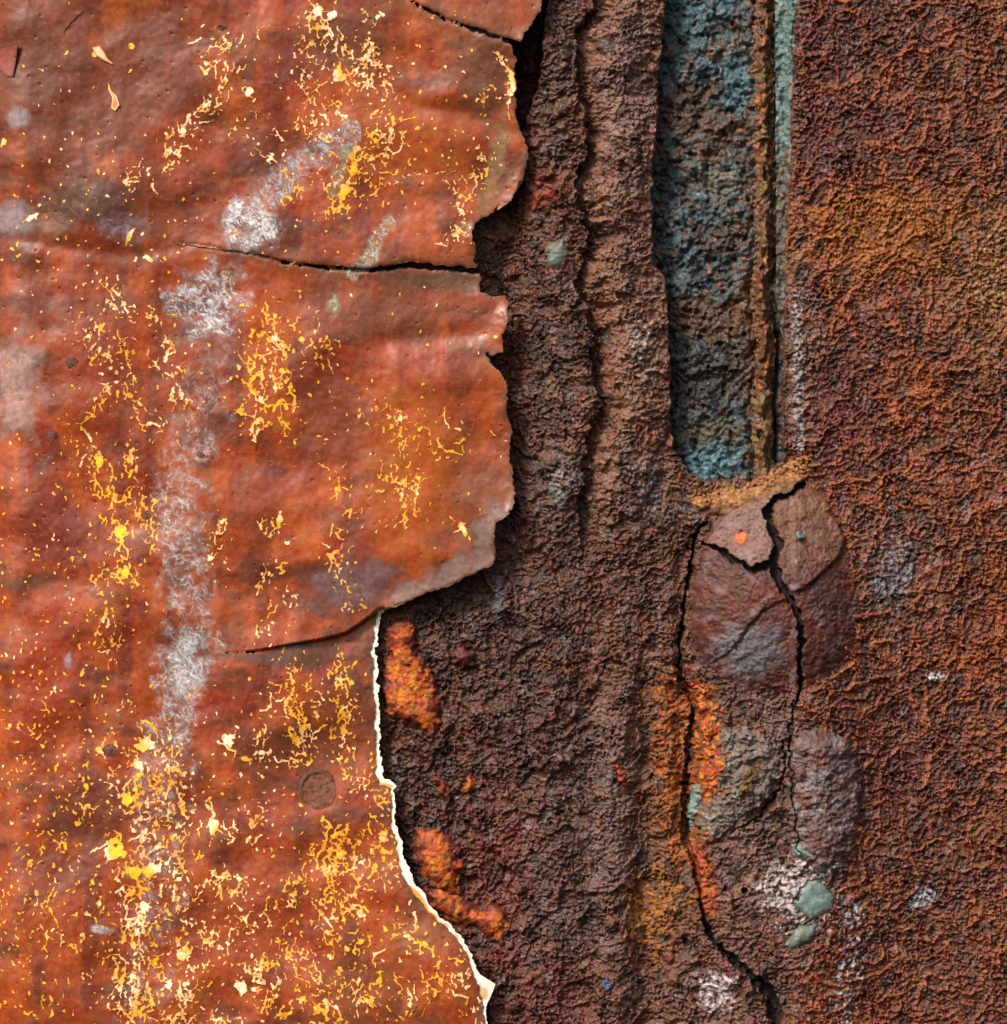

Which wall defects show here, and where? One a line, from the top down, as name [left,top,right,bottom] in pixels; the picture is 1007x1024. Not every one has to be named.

crack [176,244,480,274]
corrosion [815,191,1007,325]
peeling [0,0,516,1024]
corrosion [377,618,443,741]
corrosion [410,773,512,947]
corrosion [613,667,732,965]
crack [675,481,833,1024]
corrosion [929,552,1007,686]